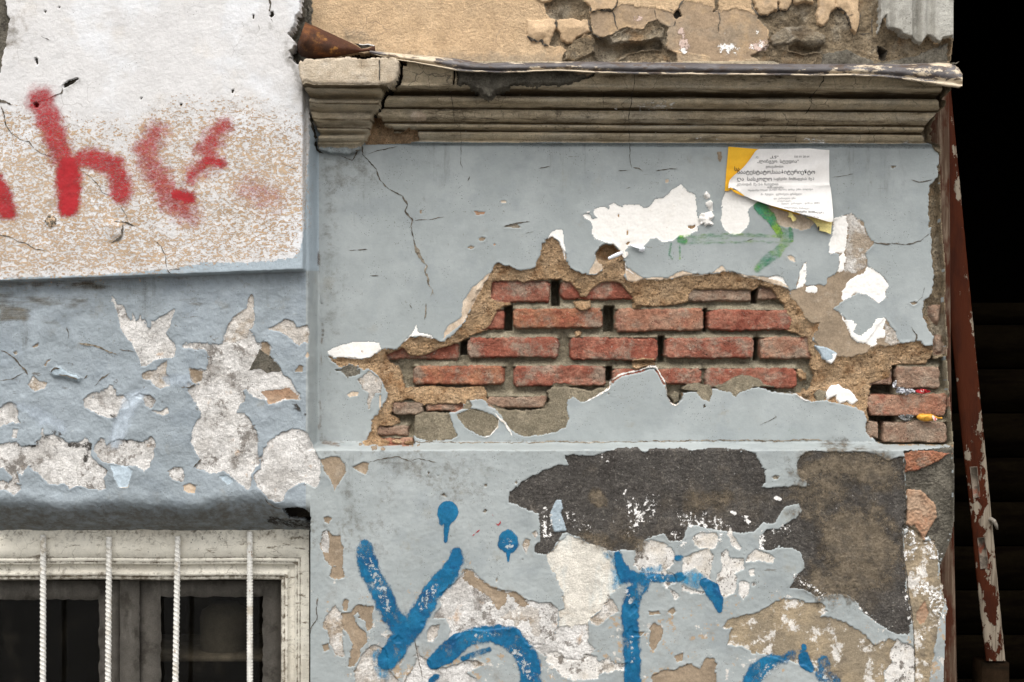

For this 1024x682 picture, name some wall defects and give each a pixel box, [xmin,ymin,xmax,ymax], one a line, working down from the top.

flaking render [526,0,959,64]
crack [309,112,440,320]
peeling [0,402,156,495]
peeling [83,385,127,418]
peeling [111,294,369,503]
flaking render [320,86,954,682]